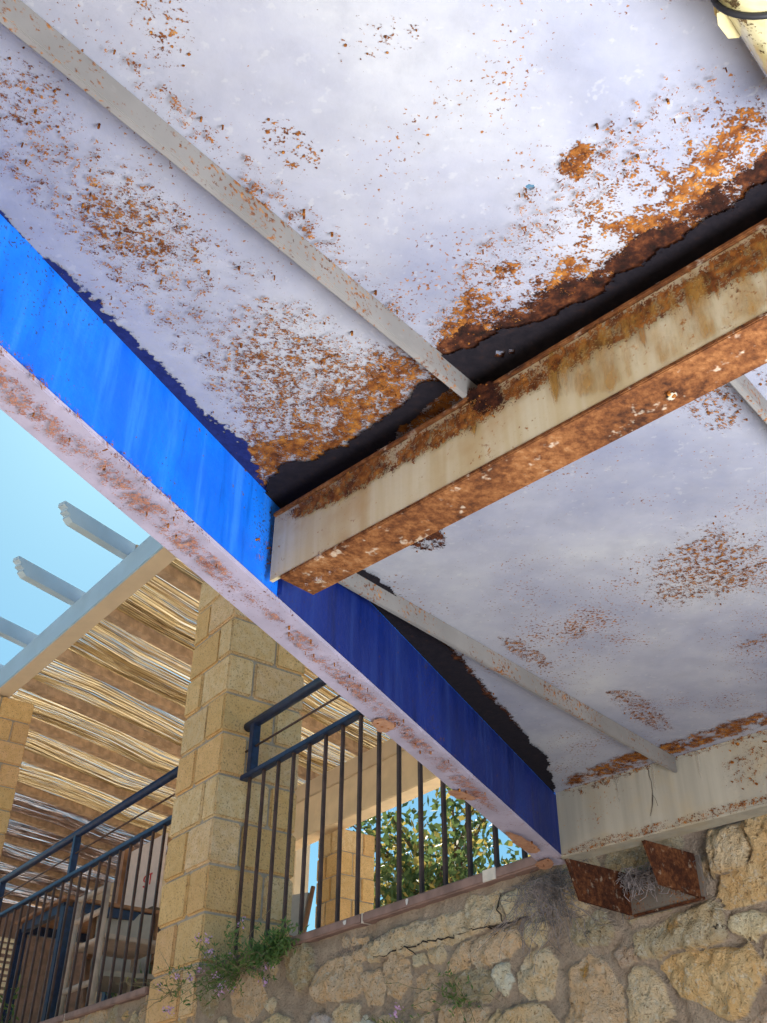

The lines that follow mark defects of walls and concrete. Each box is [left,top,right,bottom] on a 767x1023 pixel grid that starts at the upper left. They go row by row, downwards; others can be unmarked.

rust [104,0,224,166]
rust [338,17,426,72]
rust [0,47,767,519]
rust [0,336,498,812]
rust [630,516,767,612]
rust [370,601,659,795]
rust [564,690,767,855]
crack [373,894,546,957]